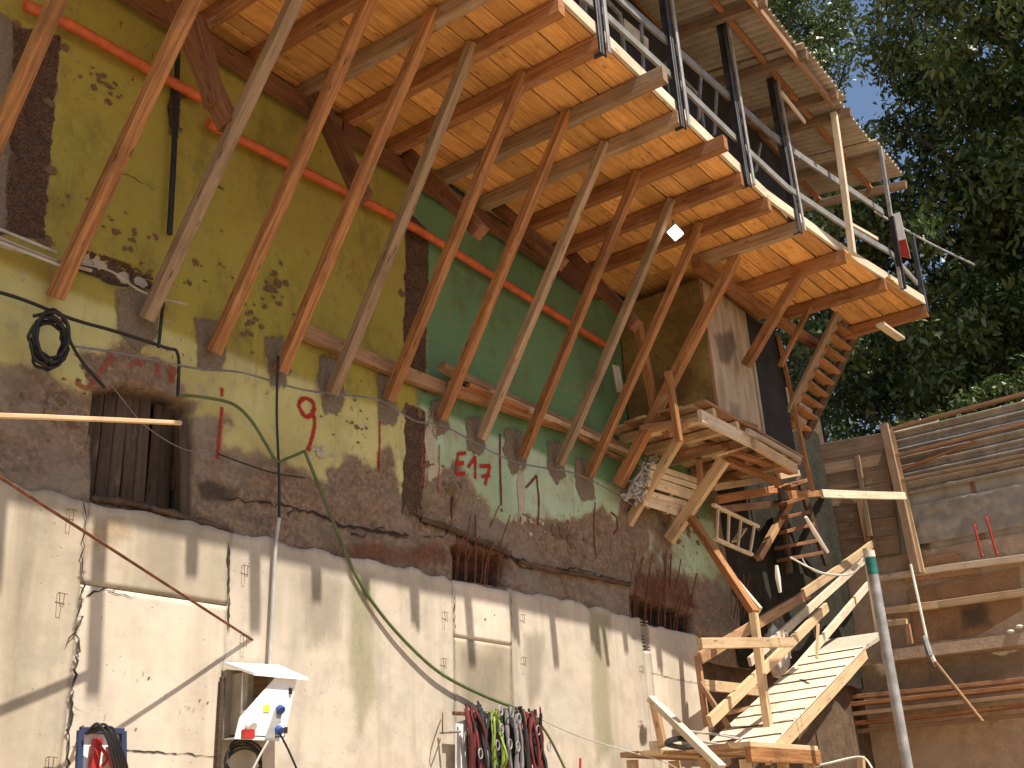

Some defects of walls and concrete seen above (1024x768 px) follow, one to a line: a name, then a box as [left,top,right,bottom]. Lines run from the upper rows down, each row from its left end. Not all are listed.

flaking render [0,12,33,104]
flaking render [0,35,70,248]
spalling [79,216,159,291]
flaking render [399,214,429,343]
flaking render [410,327,427,373]
crack [66,503,136,768]
crack [221,497,633,584]
flaking render [402,403,588,587]
spalling [628,514,700,650]
crack [127,749,215,757]